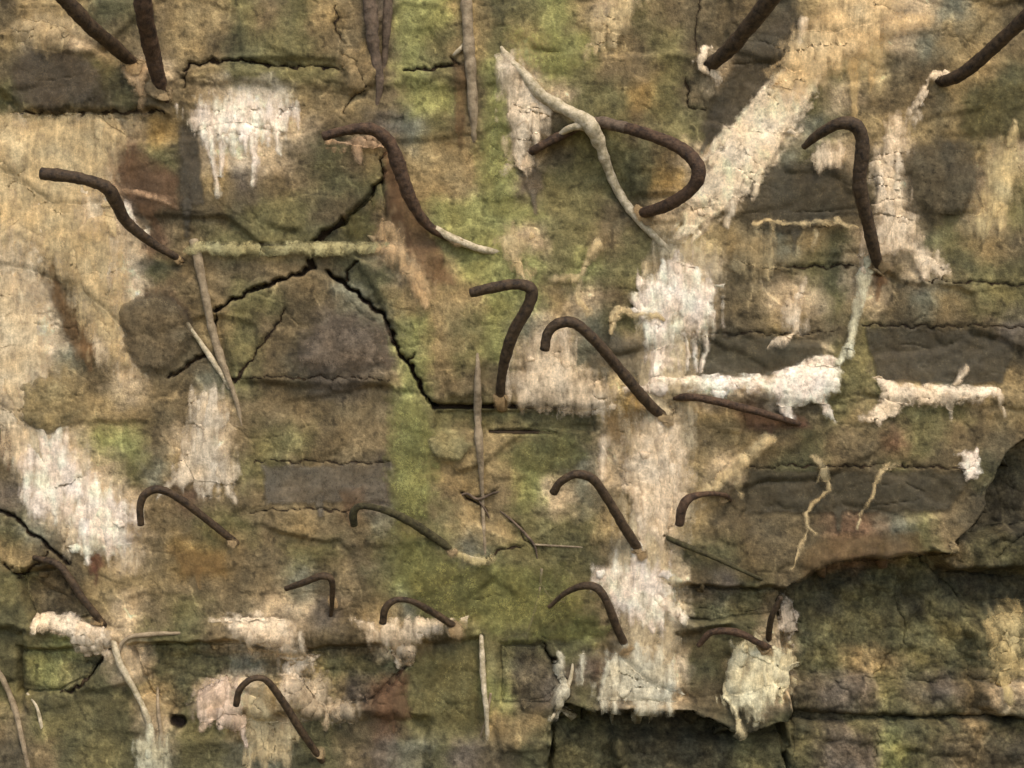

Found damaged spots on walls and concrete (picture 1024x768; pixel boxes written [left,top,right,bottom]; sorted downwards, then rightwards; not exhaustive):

crack [183,5,343,88]
crack [403,57,459,72]
rust [122,152,176,236]
rust [384,151,453,283]
damp [0,12,431,567]
crack [214,152,594,434]
crack [168,353,206,379]
damp [505,0,1013,736]
crack [0,510,71,579]